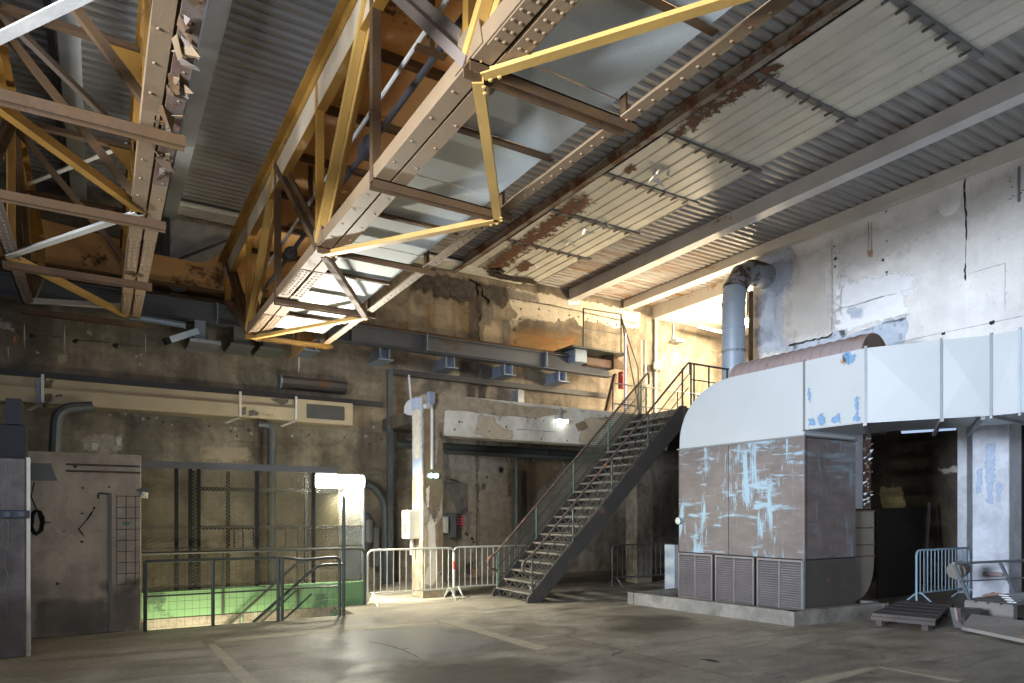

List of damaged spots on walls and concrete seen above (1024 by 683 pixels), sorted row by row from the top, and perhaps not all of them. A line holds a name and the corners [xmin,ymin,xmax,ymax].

rust [672,57,784,138]
rust [479,194,597,274]
crack [963,179,1006,303]
peeling [412,394,567,598]
peeling [976,443,1011,504]